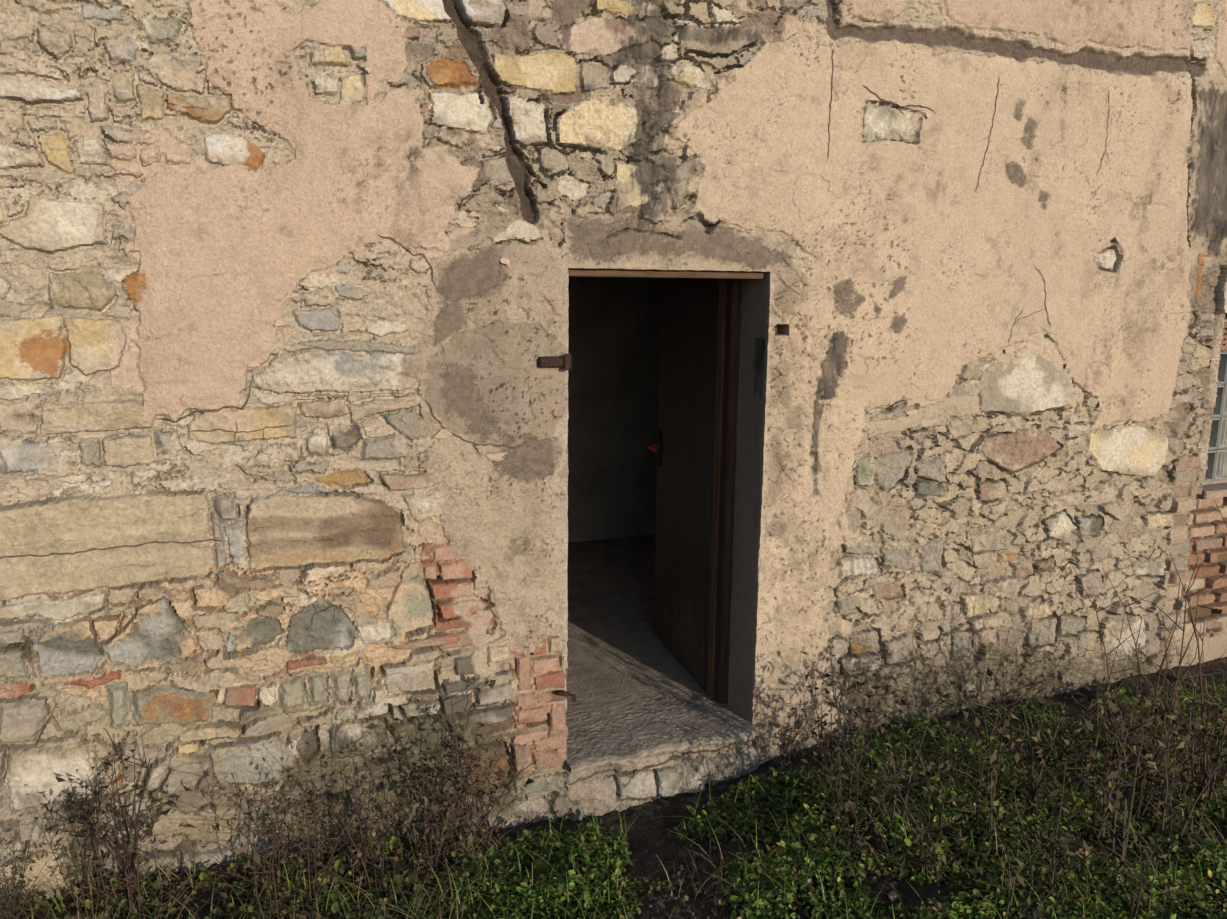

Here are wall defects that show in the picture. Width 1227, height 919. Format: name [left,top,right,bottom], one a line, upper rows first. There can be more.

spalling [304,39,374,105]
spalling [862,100,931,144]
crack [825,0,1207,247]
leakage [1007,162,1027,187]
leakage [1015,99,1038,149]
peeling [248,220,589,486]
leakage [434,249,508,345]
leakage [440,364,556,484]
peeling [765,271,852,569]
leakage [811,276,907,495]
spalling [865,328,1173,484]
spalling [1093,236,1124,273]